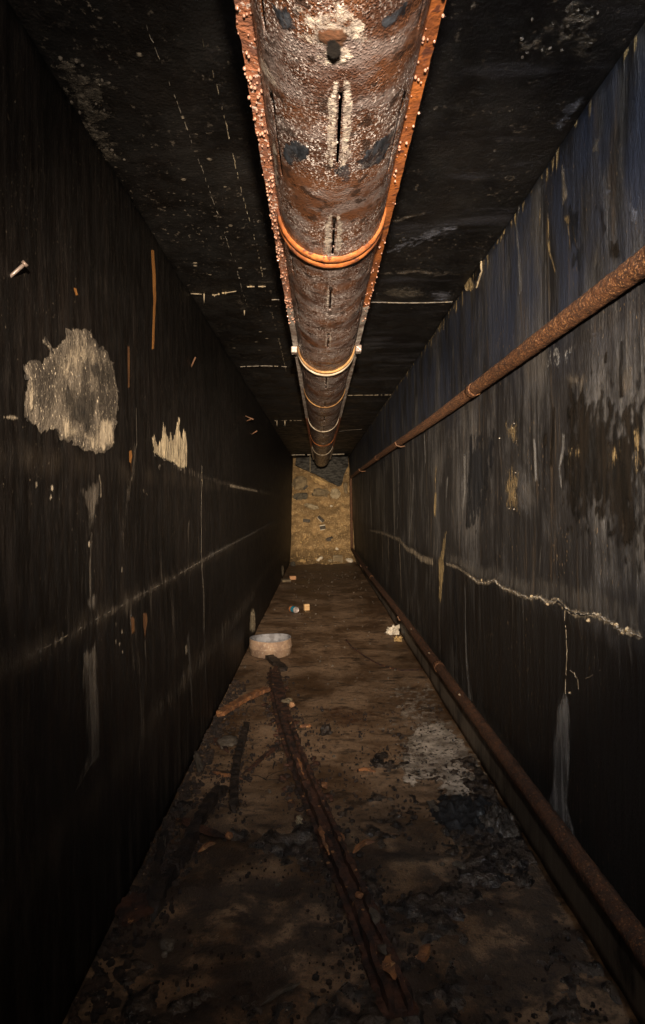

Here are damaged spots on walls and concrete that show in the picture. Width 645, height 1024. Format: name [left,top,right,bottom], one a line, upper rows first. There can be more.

peeling [6,328,119,454]
spalling [152,418,187,471]
crack [564,615,600,694]
damp [551,696,573,834]